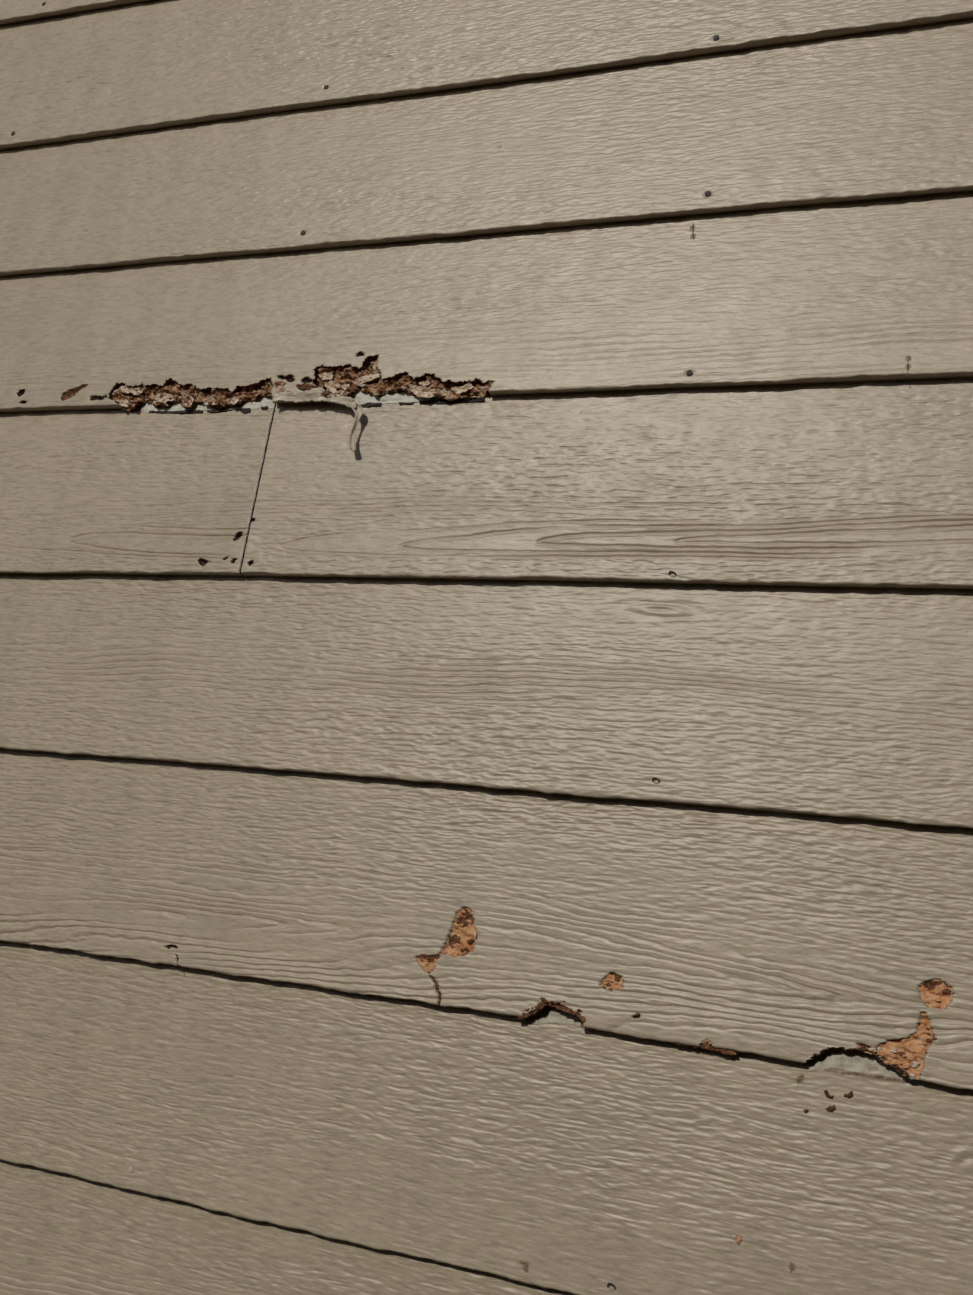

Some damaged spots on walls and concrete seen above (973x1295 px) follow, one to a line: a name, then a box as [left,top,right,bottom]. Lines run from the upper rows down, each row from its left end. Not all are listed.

spalling [61,384,239,408]
peeling [272,351,380,452]
peeling [408,380,474,398]
spalling [417,907,477,972]
spalling [601,972,623,991]
spalling [517,997,586,1028]
spalling [797,979,952,1089]
peeling [824,1090,853,1112]